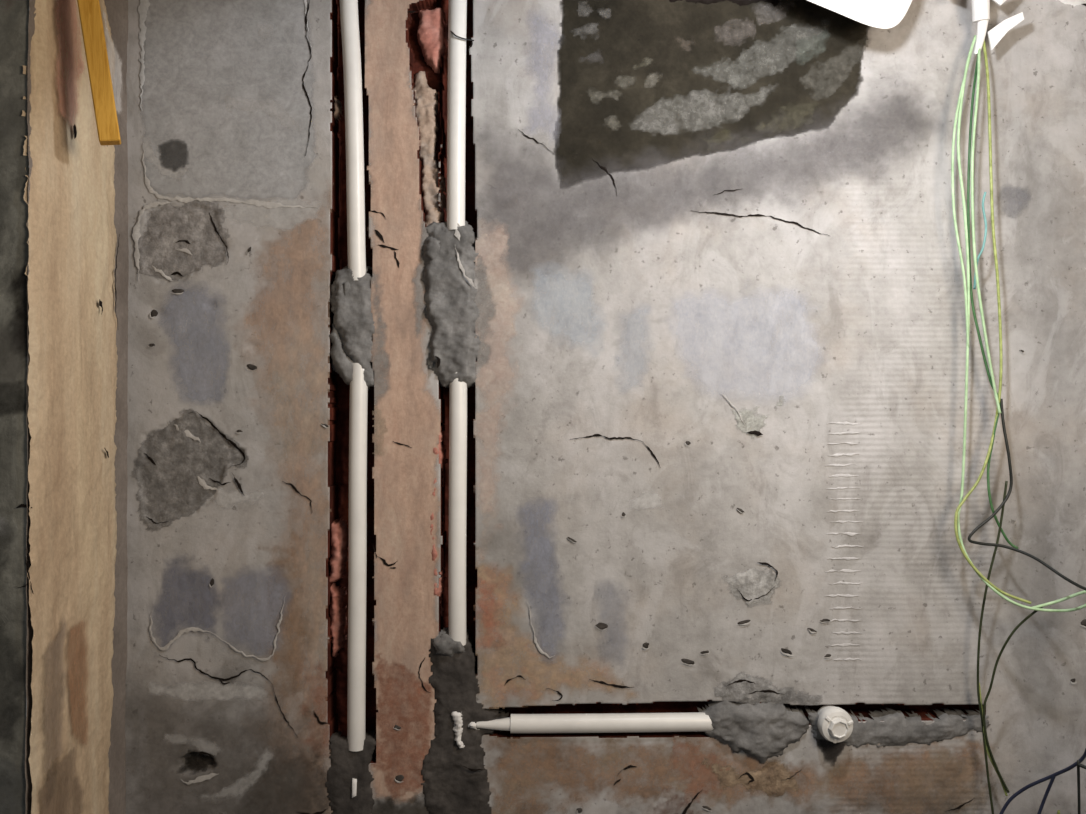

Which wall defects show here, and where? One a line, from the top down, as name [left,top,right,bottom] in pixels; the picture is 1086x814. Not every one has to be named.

peeling [554,0,869,188]
crack [696,189,829,236]
damp [12,270,28,354]
flaking render [21,0,229,814]
spalling [133,409,248,530]
crack [574,434,660,466]
spalling [725,562,781,607]
crack [164,657,330,738]